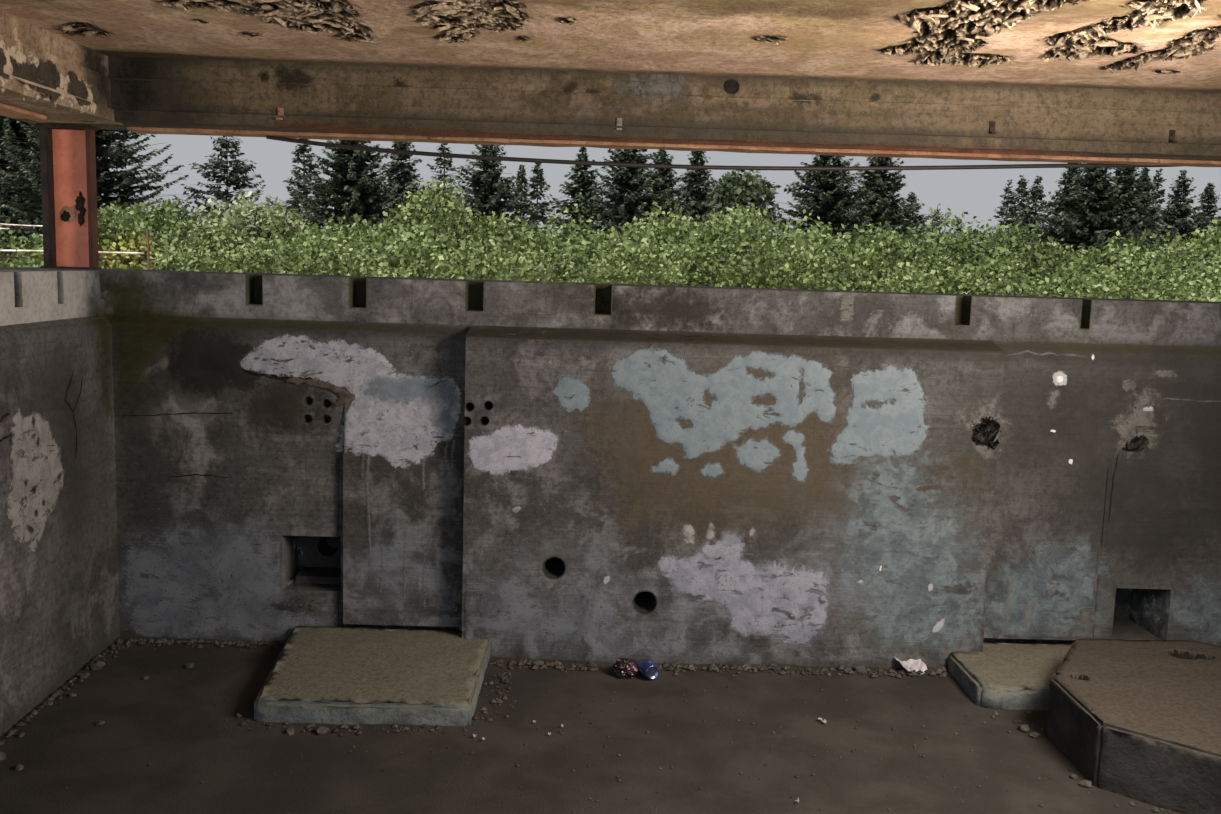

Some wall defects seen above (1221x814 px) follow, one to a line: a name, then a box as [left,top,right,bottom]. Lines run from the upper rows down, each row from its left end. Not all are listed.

spalling [156,0,381,44]
spalling [411,0,533,44]
spalling [875,0,1091,68]
spalling [1038,0,1221,76]
peeling [0,39,96,115]
rust [60,191,86,227]
peeling [7,409,64,552]
peeling [240,334,463,468]
peeling [467,424,558,475]
peeling [611,347,929,482]
peeling [657,522,830,646]